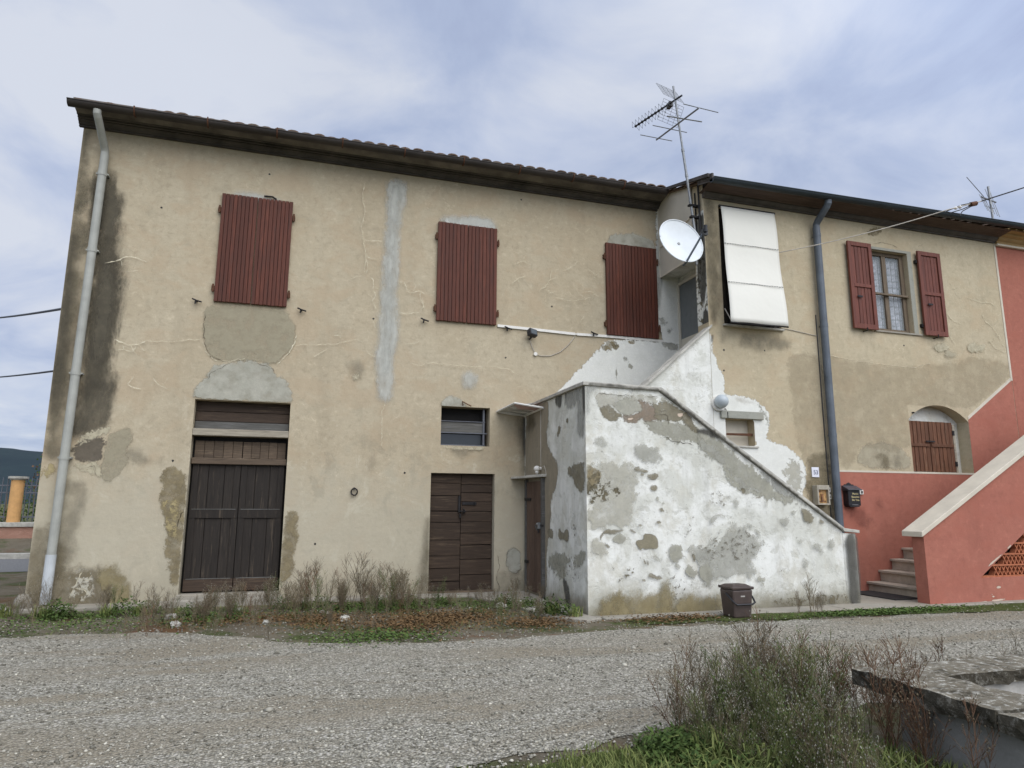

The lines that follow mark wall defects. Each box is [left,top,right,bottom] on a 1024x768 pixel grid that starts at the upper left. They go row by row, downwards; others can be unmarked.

leakage [40,145,123,478]
peeling [601,341,634,376]
peeling [71,426,111,477]
peeling [158,460,187,586]
peeling [525,392,824,599]
leakage [598,584,722,616]